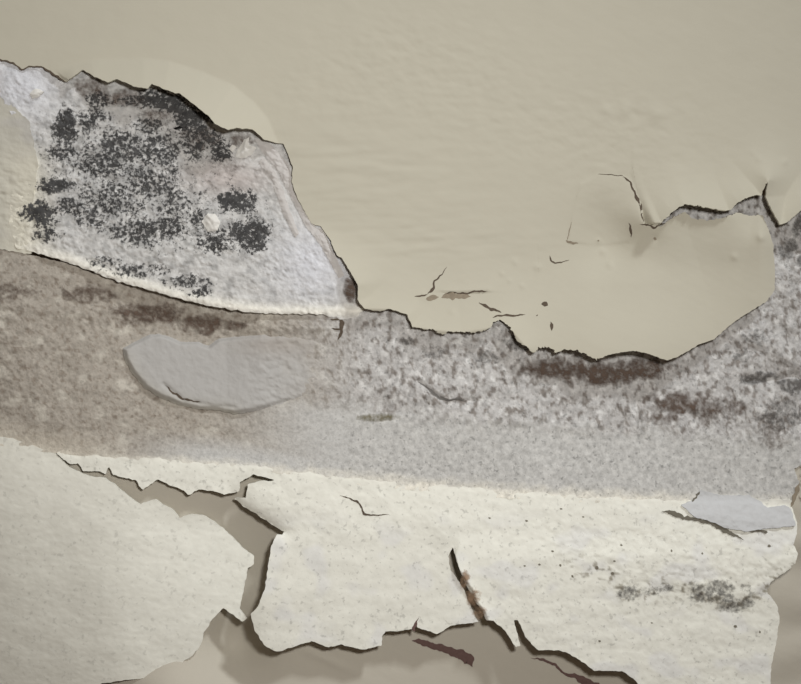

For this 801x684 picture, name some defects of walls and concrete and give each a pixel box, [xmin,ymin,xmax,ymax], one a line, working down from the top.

water stain [18,82,273,256]
spalling [0,47,365,319]
water stain [778,216,801,264]
water stain [87,256,212,298]
water stain [344,279,357,302]
crack [415,267,553,330]
water stain [115,306,246,335]
water stain [527,357,669,385]
water stain [742,371,801,393]
flaking render [0,154,801,684]
water stain [654,393,722,421]
crack [343,496,387,516]